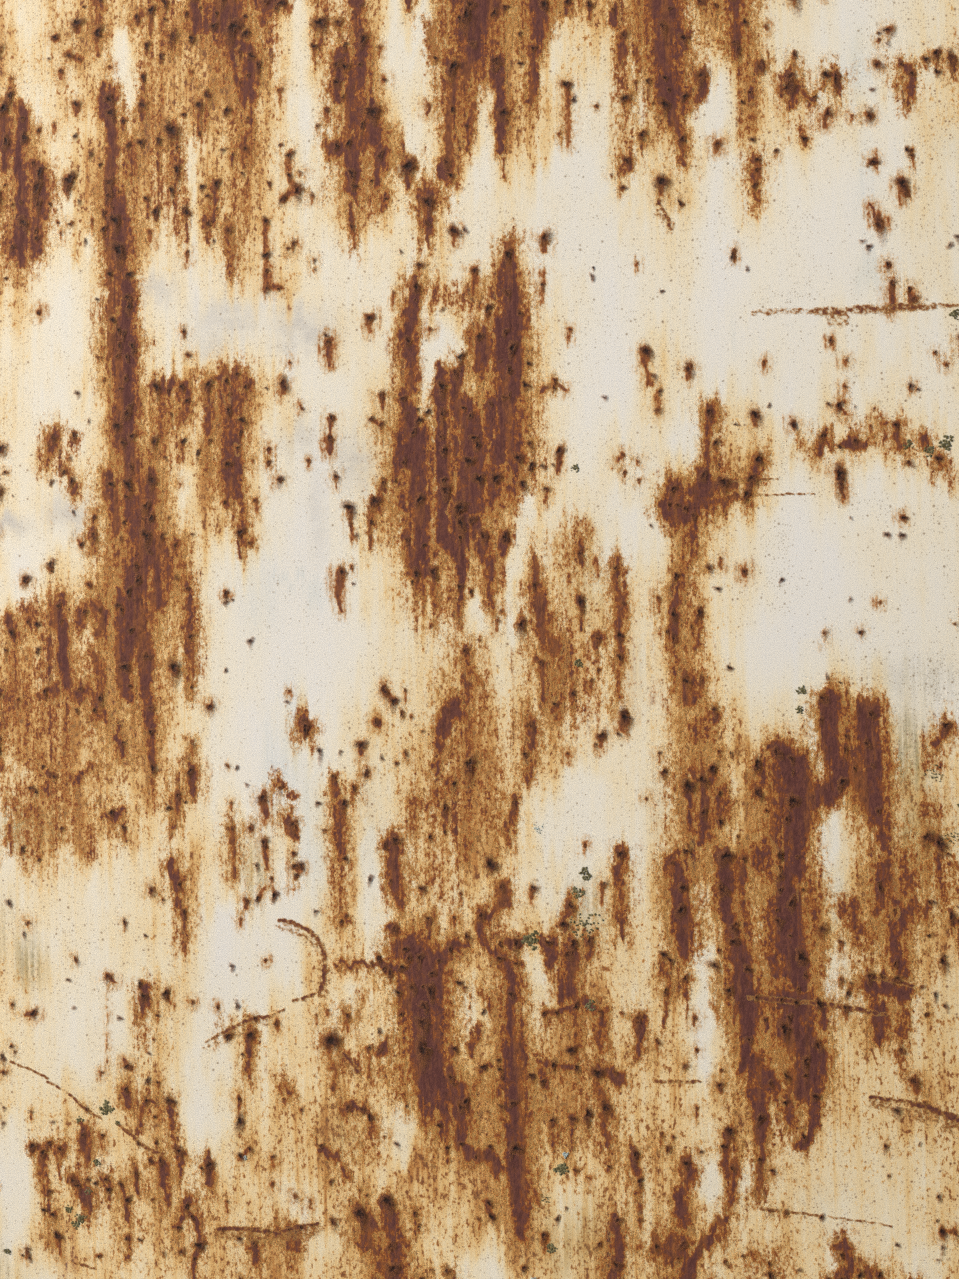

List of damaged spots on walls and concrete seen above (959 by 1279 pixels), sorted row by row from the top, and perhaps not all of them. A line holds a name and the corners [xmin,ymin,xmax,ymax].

corrosion [0,1043,17,1080]
corrosion [0,0,324,962]
corrosion [283,679,413,934]
corrosion [307,0,959,1279]